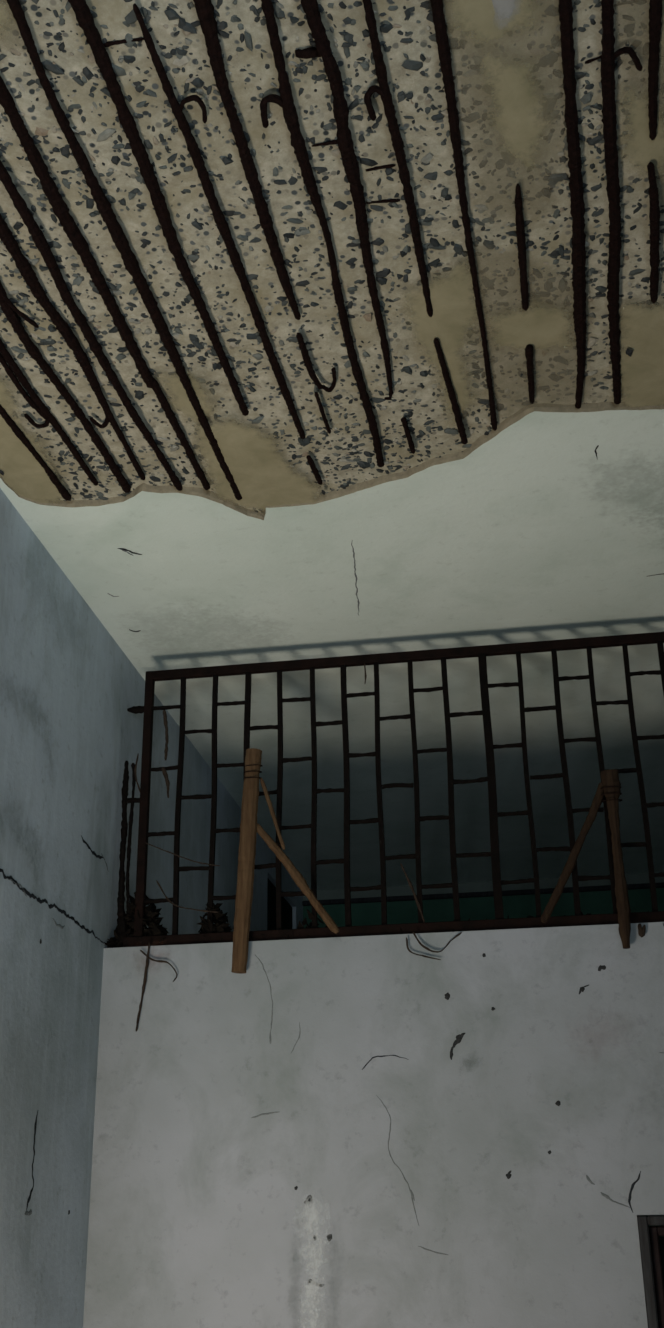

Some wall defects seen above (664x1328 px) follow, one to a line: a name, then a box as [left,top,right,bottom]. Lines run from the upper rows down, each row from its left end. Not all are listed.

spalling [0,0,664,520]
crack [81,835,108,870]
crack [0,869,105,943]